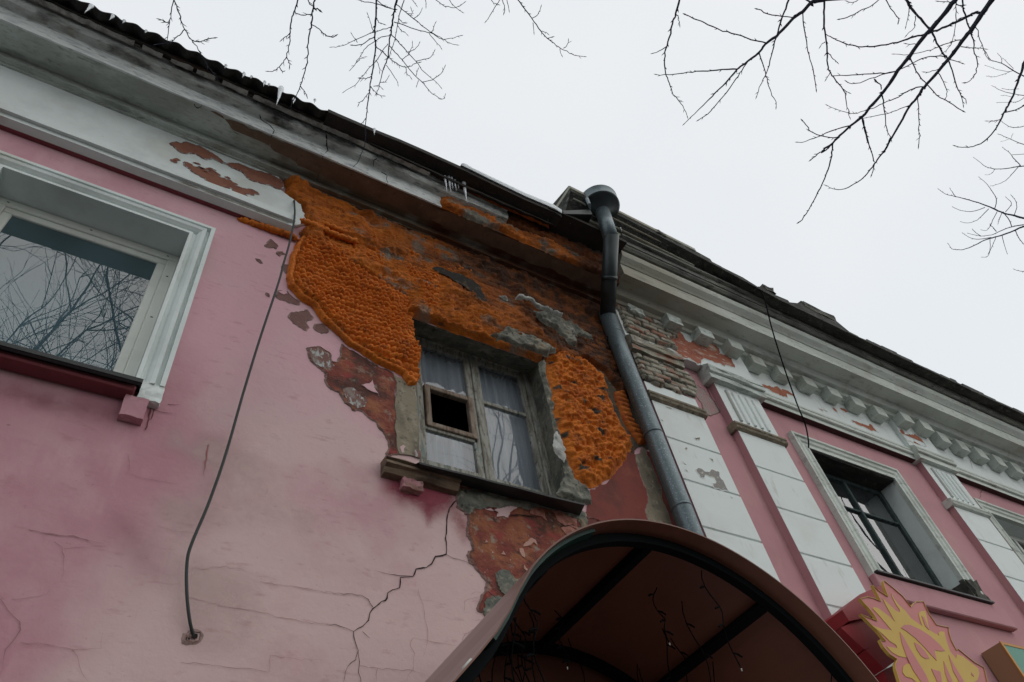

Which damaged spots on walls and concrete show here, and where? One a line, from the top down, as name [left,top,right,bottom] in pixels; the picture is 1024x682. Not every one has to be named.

peeling [169,141,285,196]
peeling [265,290,421,459]
peeling [211,111,601,291]
spalling [432,266,487,302]
peeling [455,294,677,617]
flaking render [616,304,736,416]
peeling [683,436,733,499]
crack [189,501,496,679]